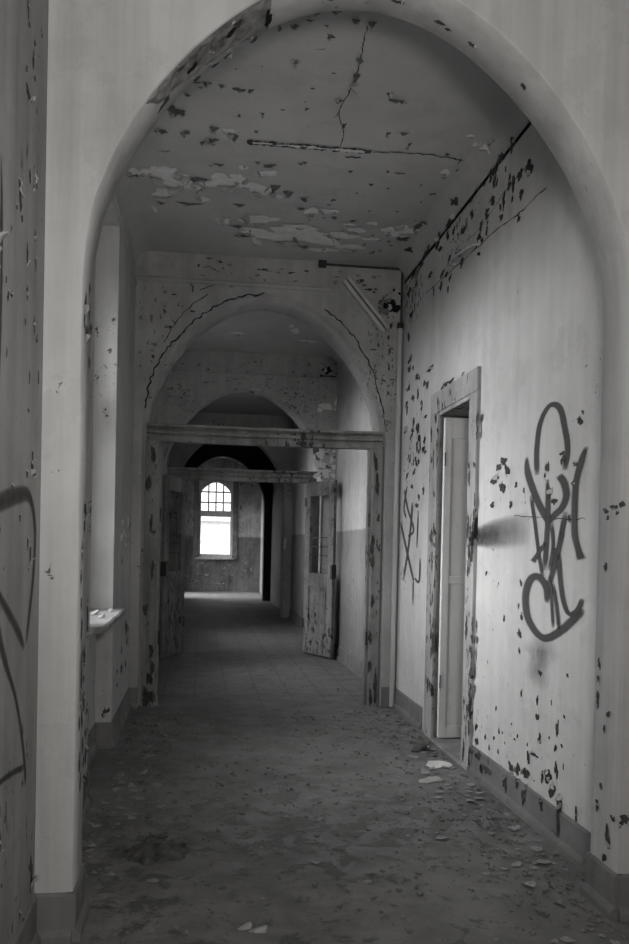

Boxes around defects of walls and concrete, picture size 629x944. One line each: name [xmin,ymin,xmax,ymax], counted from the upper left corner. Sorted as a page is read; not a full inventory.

flaking render [147,0,335,119]
crack [336,26,368,146]
flaking render [200,126,372,158]
crack [372,152,464,161]
flaking render [126,134,533,508]
peeling [466,462,475,578]
peeling [368,660,387,718]
peeling [382,615,565,838]
peeling [594,658,610,732]
peeling [482,812,567,888]
peeling [601,815,629,862]